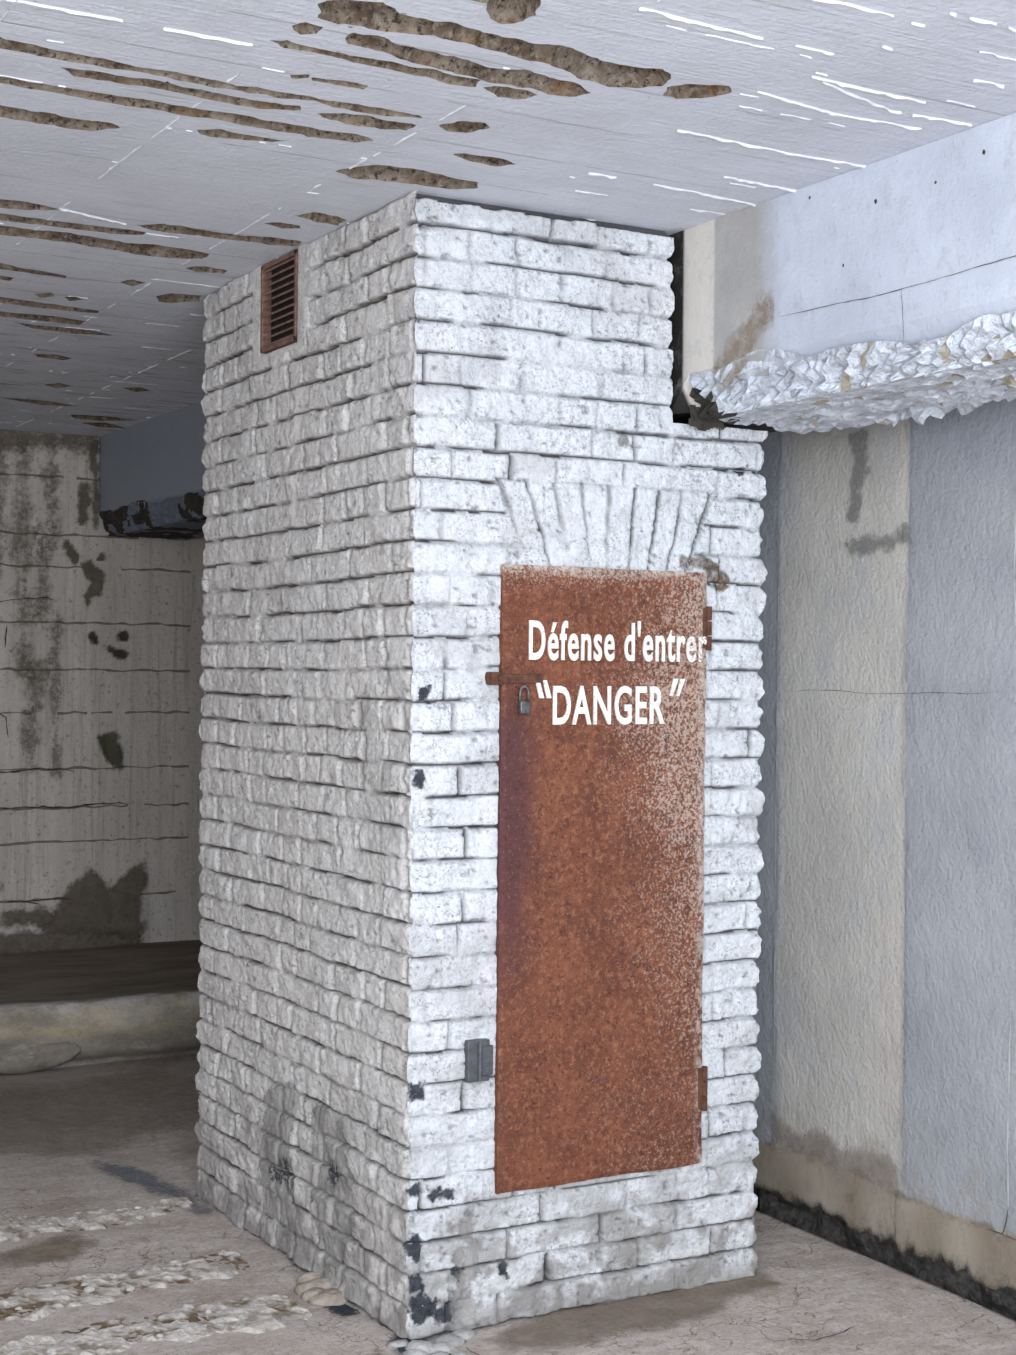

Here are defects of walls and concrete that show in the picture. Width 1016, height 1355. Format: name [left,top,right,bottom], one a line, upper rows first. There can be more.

spalling [0,37,422,143]
spalling [439,121,489,133]
spalling [270,0,732,99]
spalling [336,165,478,190]
spalling [0,199,346,274]
spalling [689,311,1016,434]
leakage [89,439,101,528]
spalling [78,483,207,540]
leakage [0,439,60,754]
leakage [0,862,148,954]
leakage [269,1156,294,1190]
leakage [323,1160,347,1188]